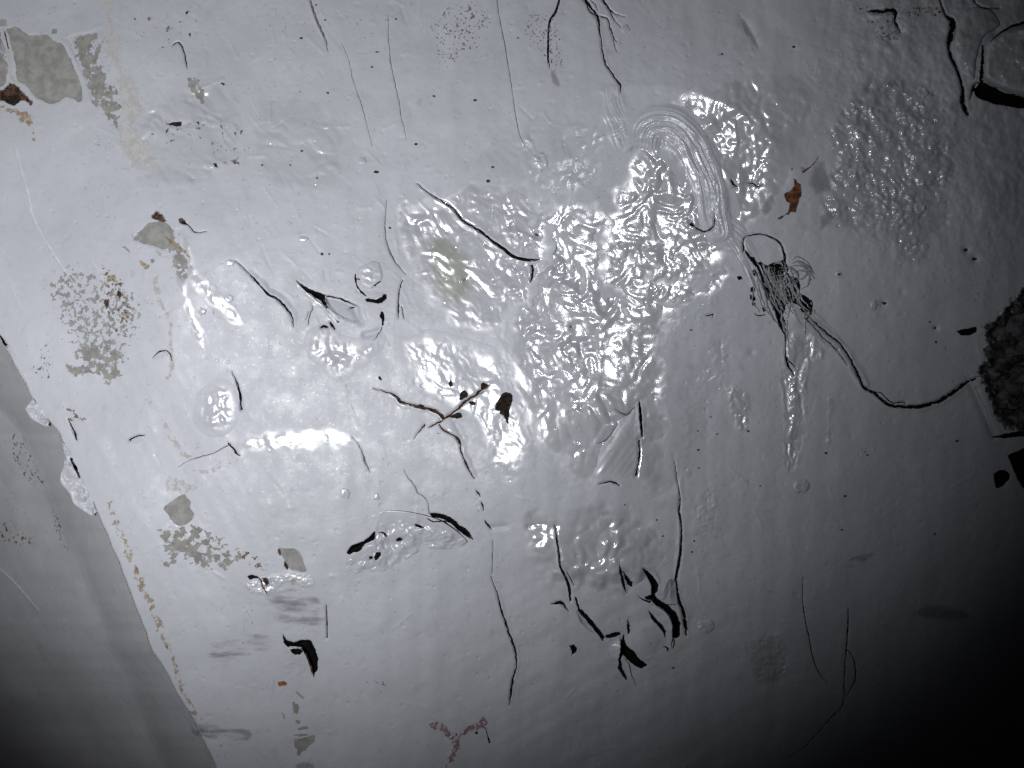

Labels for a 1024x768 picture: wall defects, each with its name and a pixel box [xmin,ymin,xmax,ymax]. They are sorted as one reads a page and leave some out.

spalling [0,27,121,128]
crack [544,0,625,93]
crack [939,0,1024,115]
crack [415,183,540,282]
corrosion [778,167,805,219]
peeling [43,262,146,385]
crack [754,301,977,414]
spalling [965,287,1024,436]
peeling [157,494,316,597]
crack [373,385,521,706]
crack [552,525,574,611]
crack [638,462,690,651]